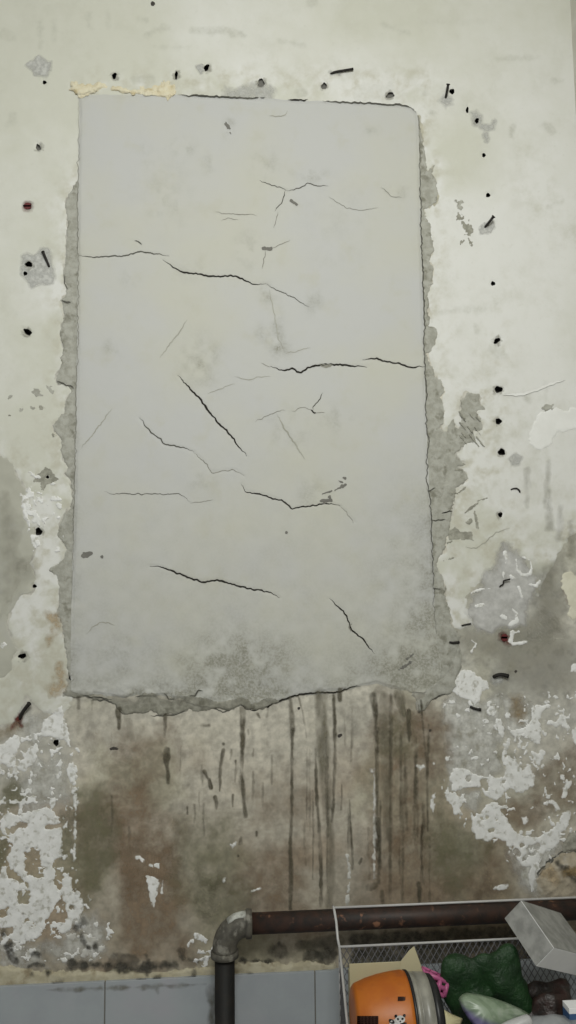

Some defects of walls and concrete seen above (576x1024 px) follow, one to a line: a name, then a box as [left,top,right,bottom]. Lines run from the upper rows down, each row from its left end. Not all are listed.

crack [57,94,452,631]
peeling [0,181,114,966]
crack [329,598,375,654]
spalling [411,113,576,892]
damp [1,931,50,975]
damp [68,785,187,980]
damp [203,719,245,804]
damp [251,775,299,910]
damp [305,949,337,965]
damp [315,688,342,840]
damp [360,692,440,903]
damp [350,927,531,964]